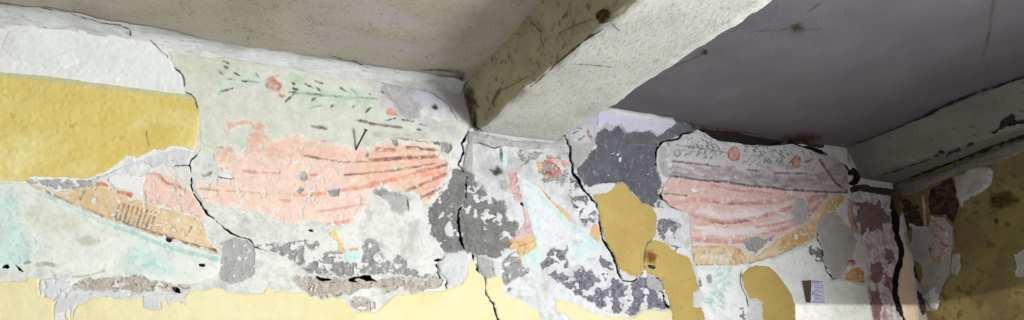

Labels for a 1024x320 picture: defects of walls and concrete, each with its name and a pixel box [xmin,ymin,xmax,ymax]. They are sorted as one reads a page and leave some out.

peeling [26,148,193,196]
peeling [39,274,190,320]
crack [181,155,263,250]
spalling [218,167,528,312]
crack [421,70,503,320]
spalling [540,246,667,316]
crack [564,135,669,308]
spalling [517,110,770,251]
peeling [689,258,711,306]
peeling [739,299,763,320]
spalling [791,166,993,320]
crack [882,158,931,320]